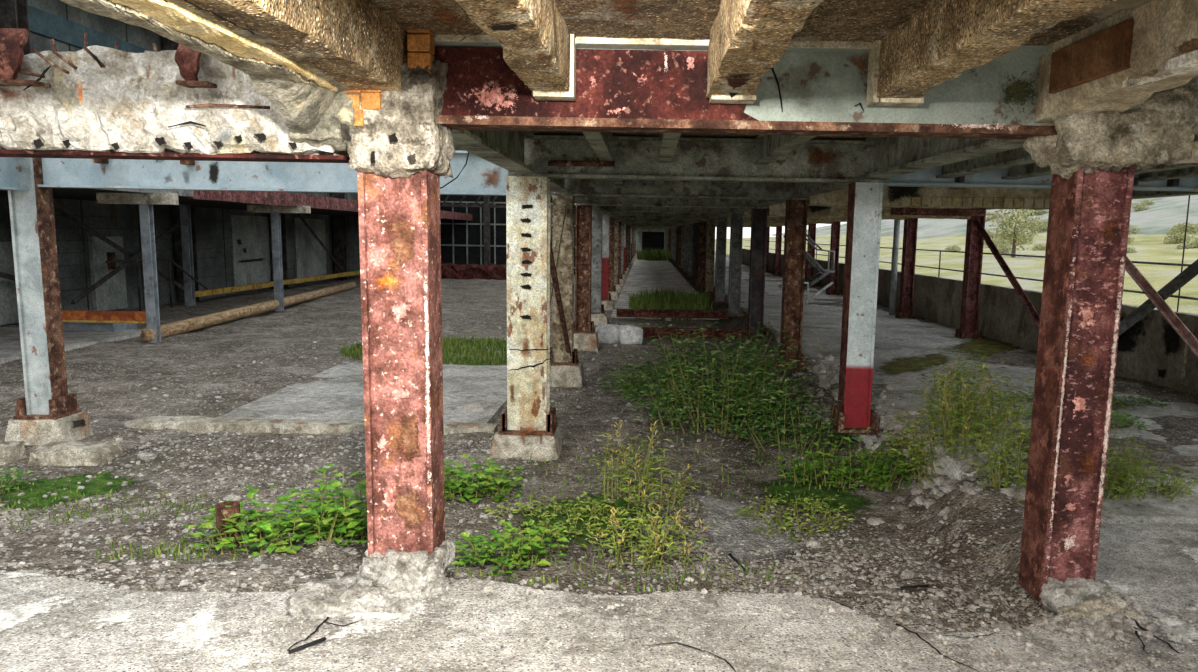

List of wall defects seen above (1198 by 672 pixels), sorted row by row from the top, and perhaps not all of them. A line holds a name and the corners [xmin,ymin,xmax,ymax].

corrosion [433,46,759,121]
spalling [213,133,266,149]
spalling [340,123,352,142]
corrosion [377,218,416,289]
corrosion [400,410,421,460]
corrosion [395,490,420,528]